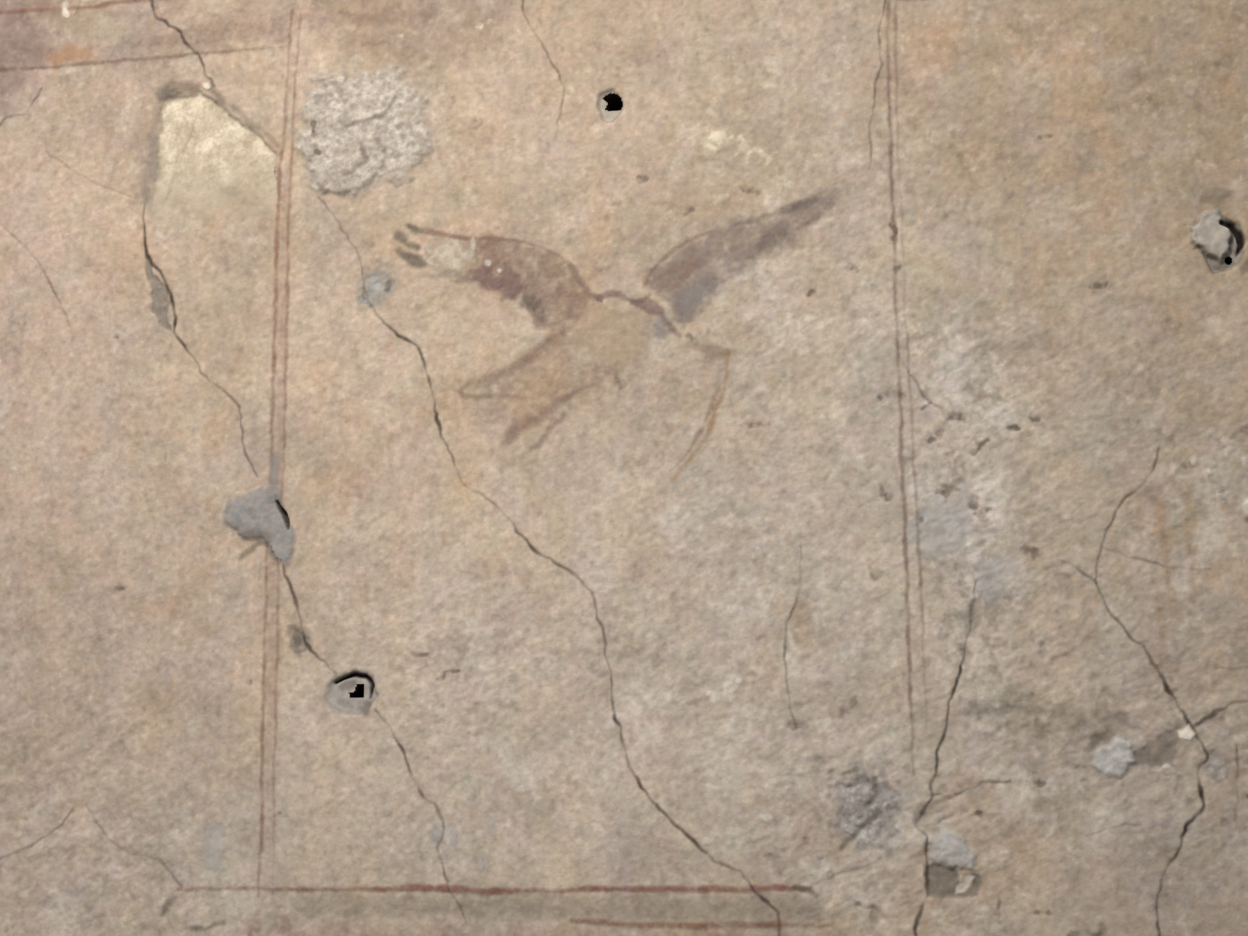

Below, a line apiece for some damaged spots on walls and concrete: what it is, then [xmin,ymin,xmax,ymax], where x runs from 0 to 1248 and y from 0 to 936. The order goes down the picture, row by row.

crack [151,0,204,65]
spalling [155,82,277,202]
spalling [147,260,171,329]
crack [144,226,186,347]
crack [949,664,962,700]
crack [1164,680,1214,860]
crack [637,778,703,851]
spalling [830,770,901,850]
spalling [926,830,980,897]